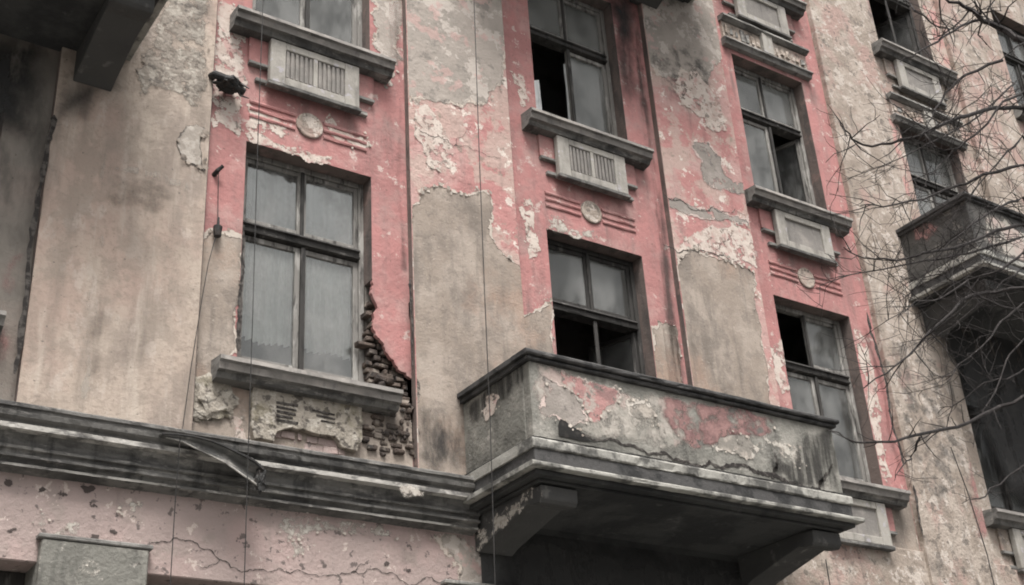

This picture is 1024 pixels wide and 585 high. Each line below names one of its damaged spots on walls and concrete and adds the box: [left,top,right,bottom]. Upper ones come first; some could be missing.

peeling [136,0,332,173]
peeling [192,0,790,475]
crack [151,537,454,585]
peeling [279,512,399,558]
crack [581,432,833,490]
peeling [853,329,892,482]